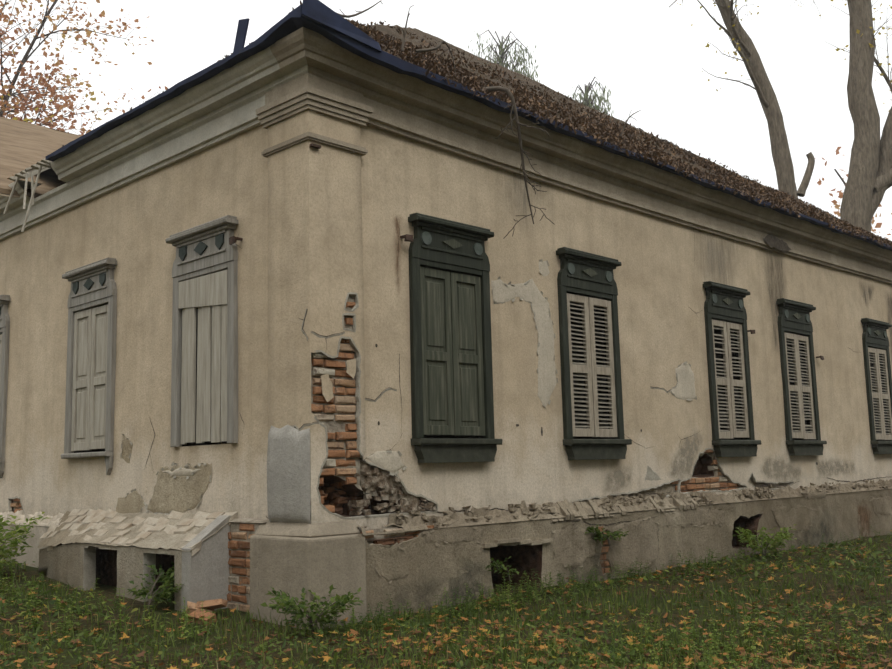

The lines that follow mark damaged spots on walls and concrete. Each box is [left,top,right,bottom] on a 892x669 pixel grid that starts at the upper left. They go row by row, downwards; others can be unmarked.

peeling [491,259,558,407]
spalling [311,292,561,548]
spalling [227,518,280,612]
spalling [550,436,853,577]